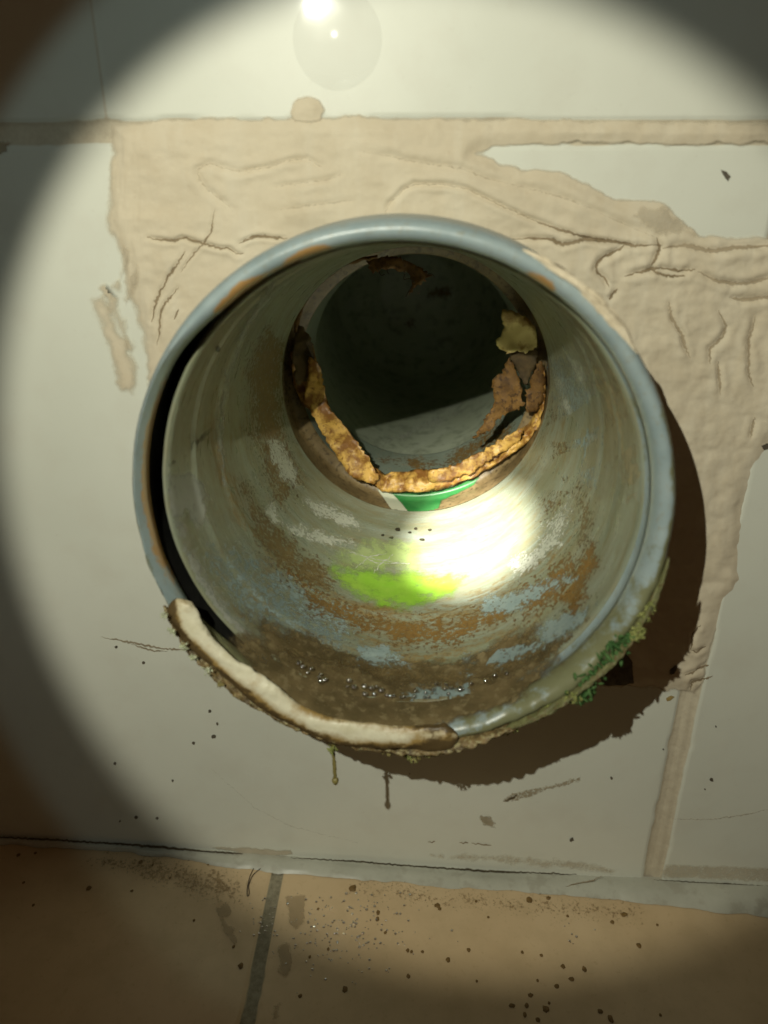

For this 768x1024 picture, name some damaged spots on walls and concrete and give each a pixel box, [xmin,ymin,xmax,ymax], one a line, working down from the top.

crack [147,214,287,342]
crack [464,188,768,390]
corrosion [380,420,516,471]
crack [103,637,181,652]
corrosion [278,541,603,655]